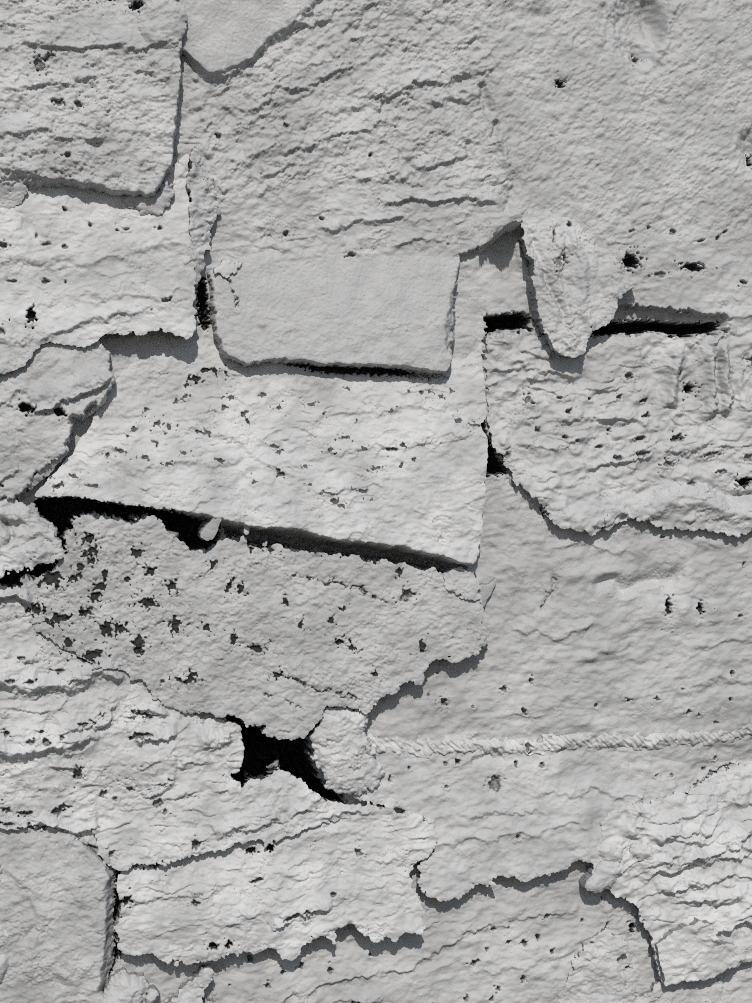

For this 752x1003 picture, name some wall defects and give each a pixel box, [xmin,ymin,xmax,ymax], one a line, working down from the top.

crack [195,277,238,332]
crack [284,363,414,377]
crack [481,420,507,477]
crack [0,496,445,603]
peeling [0,209,752,1003]